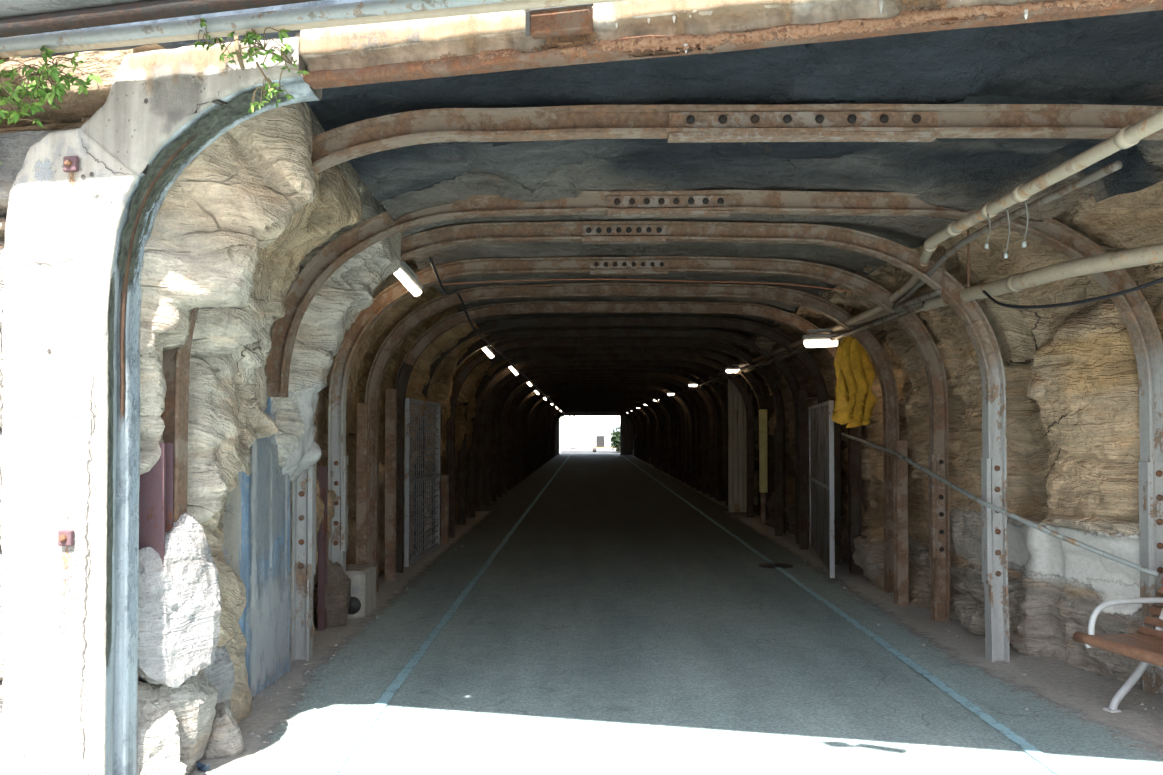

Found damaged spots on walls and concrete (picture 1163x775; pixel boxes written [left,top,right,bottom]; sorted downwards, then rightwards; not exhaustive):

crack [67,316,99,774]